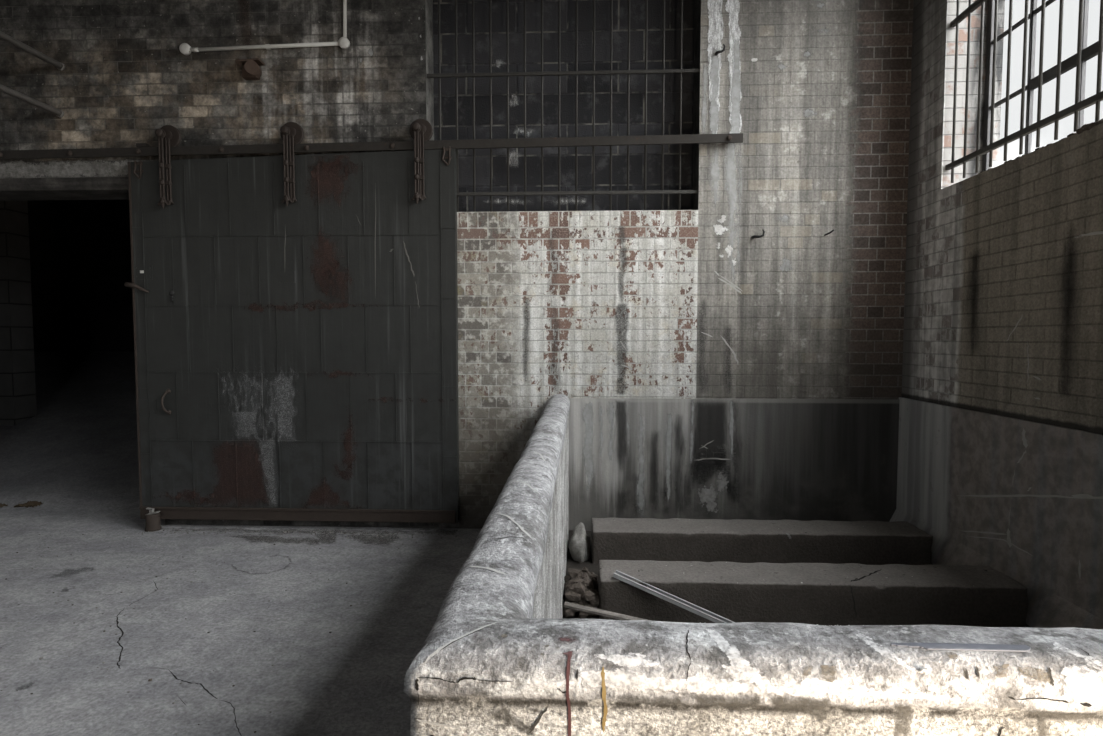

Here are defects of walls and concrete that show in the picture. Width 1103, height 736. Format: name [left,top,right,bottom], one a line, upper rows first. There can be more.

water stain [702,0,742,278]
water stain [583,227,739,511]
crack [116,582,158,669]
crack [149,667,242,736]
crack [684,629,692,687]